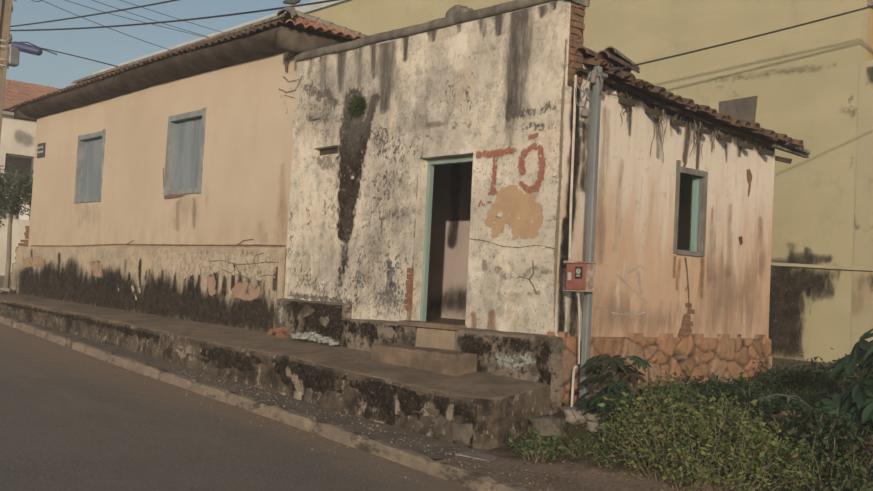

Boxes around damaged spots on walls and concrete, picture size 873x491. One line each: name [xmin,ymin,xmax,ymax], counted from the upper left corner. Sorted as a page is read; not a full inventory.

water stain [320,36,409,159]
water stain [495,1,557,117]
peeling [130,118,456,350]
peeling [482,39,567,327]
water stain [0,302,159,343]
water stain [16,249,278,332]
water stain [285,301,407,346]
water stain [768,248,839,358]
water stain [199,344,477,449]